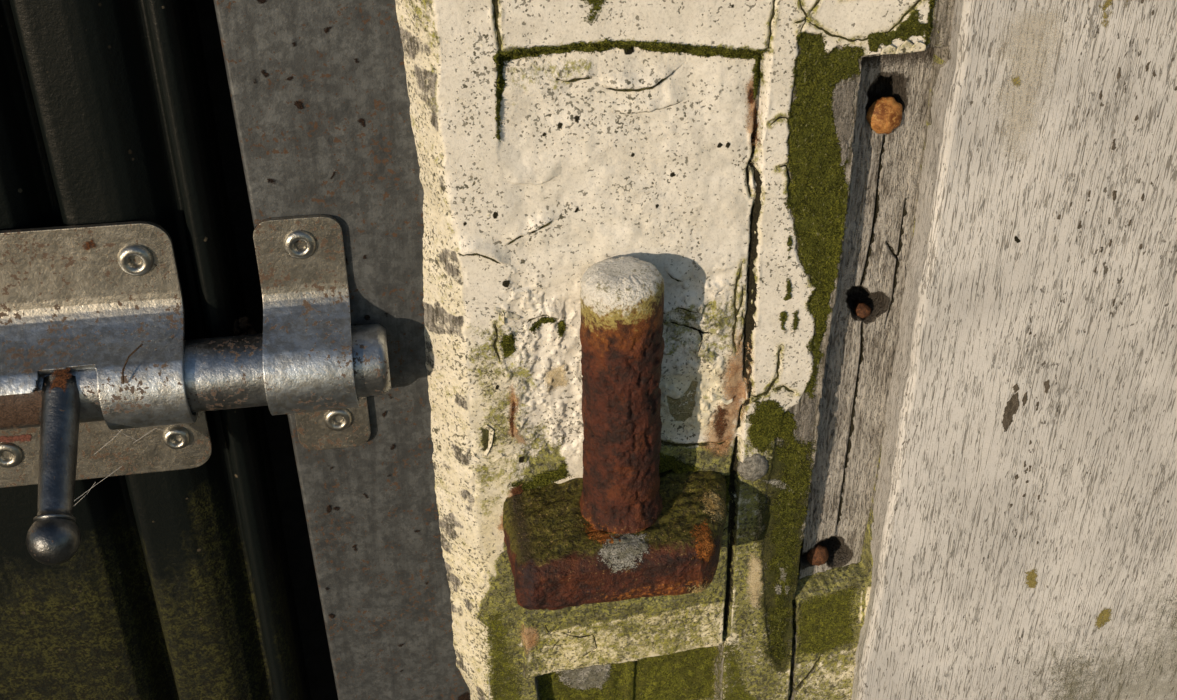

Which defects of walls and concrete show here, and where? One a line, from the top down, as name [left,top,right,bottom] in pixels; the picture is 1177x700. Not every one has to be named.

crack [768,0,921,48]
rust [746,78,760,144]
peeling [495,307,521,327]
rust [509,389,525,443]
peeling [667,381,733,422]
rust [705,339,749,454]
crack [661,117,795,630]
peeling [472,425,503,463]
rust [688,489,726,593]